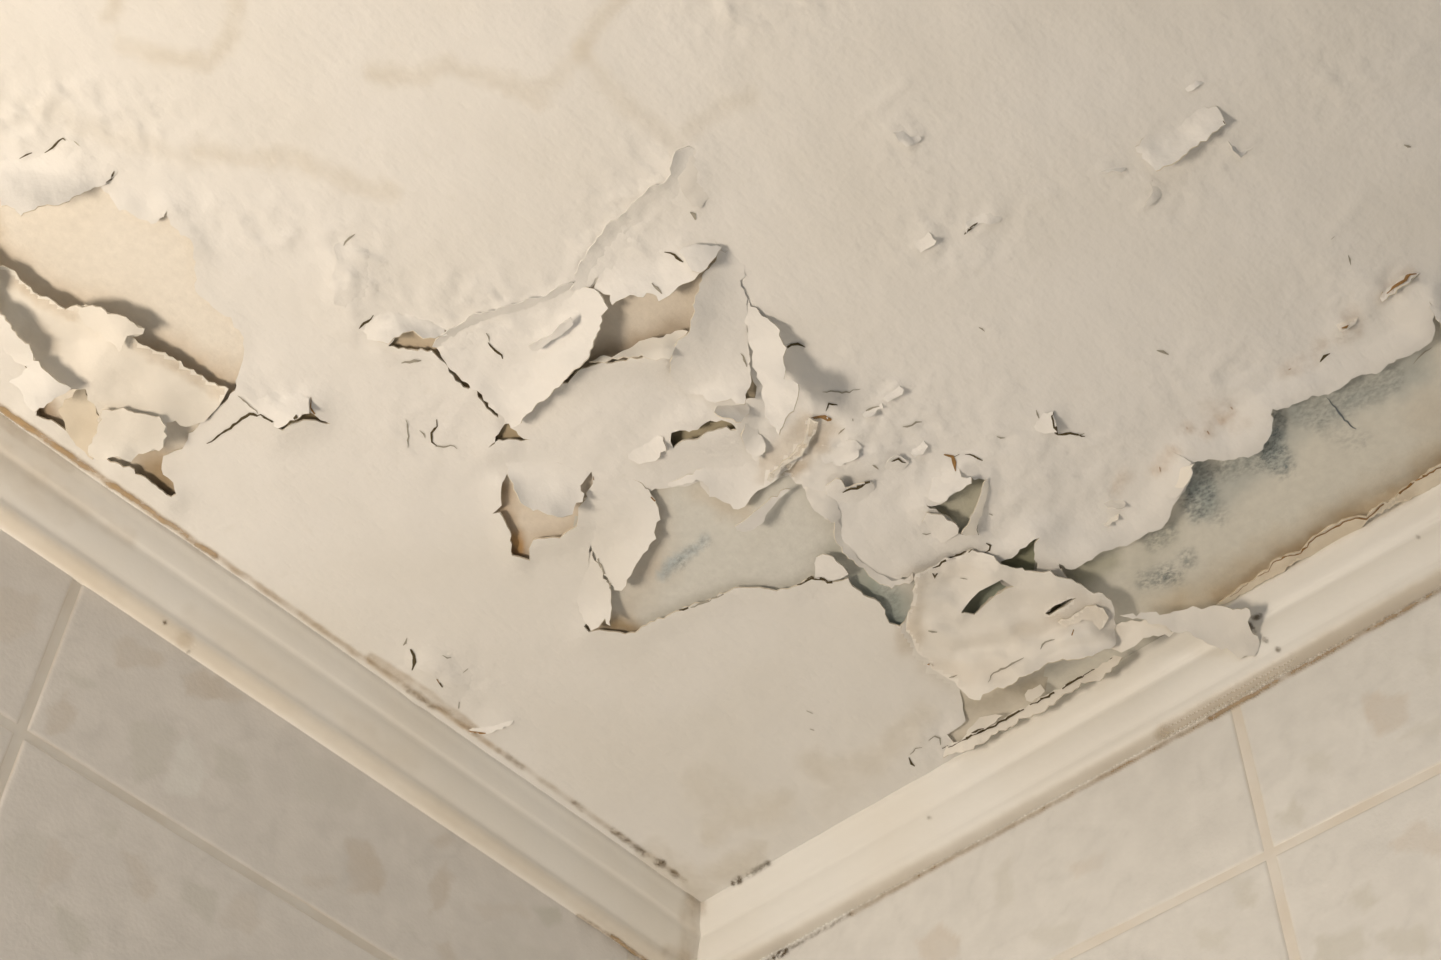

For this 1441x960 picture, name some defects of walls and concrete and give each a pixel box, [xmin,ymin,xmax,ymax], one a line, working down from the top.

peeling [0,141,328,496]
peeling [361,146,1441,758]
peeling [1135,106,1254,207]
damp [1209,593,1432,720]